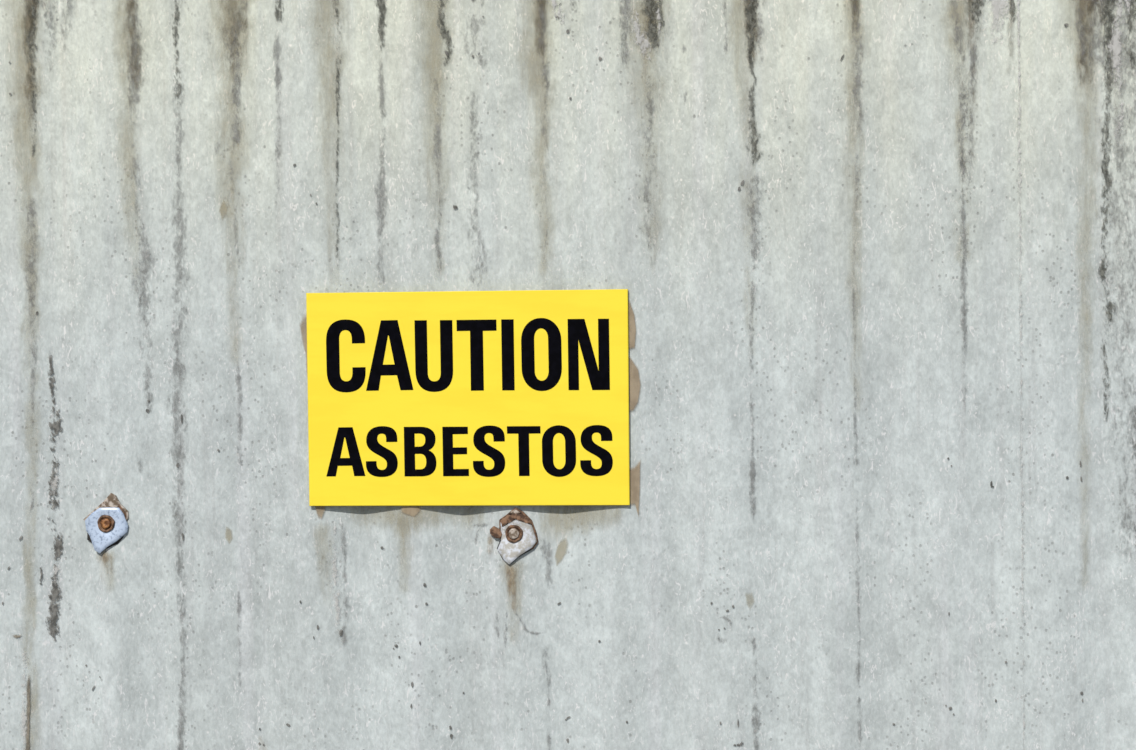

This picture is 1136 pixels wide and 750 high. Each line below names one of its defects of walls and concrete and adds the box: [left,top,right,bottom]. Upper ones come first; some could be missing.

water stain [9,0,38,130]
water stain [1064,0,1136,289]
rust [490,509,532,541]